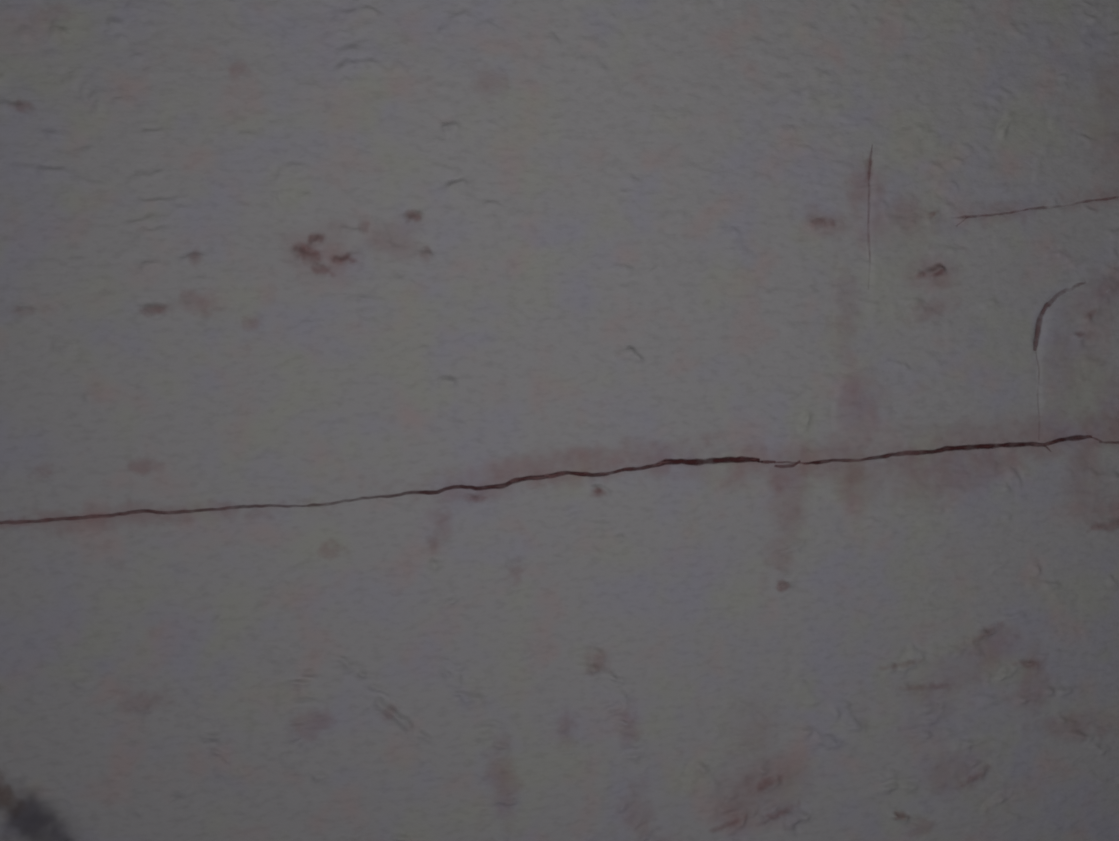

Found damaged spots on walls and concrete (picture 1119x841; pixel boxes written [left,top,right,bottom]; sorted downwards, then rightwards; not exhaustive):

crack [389,435,1117,497]
crack [0,505,265,523]